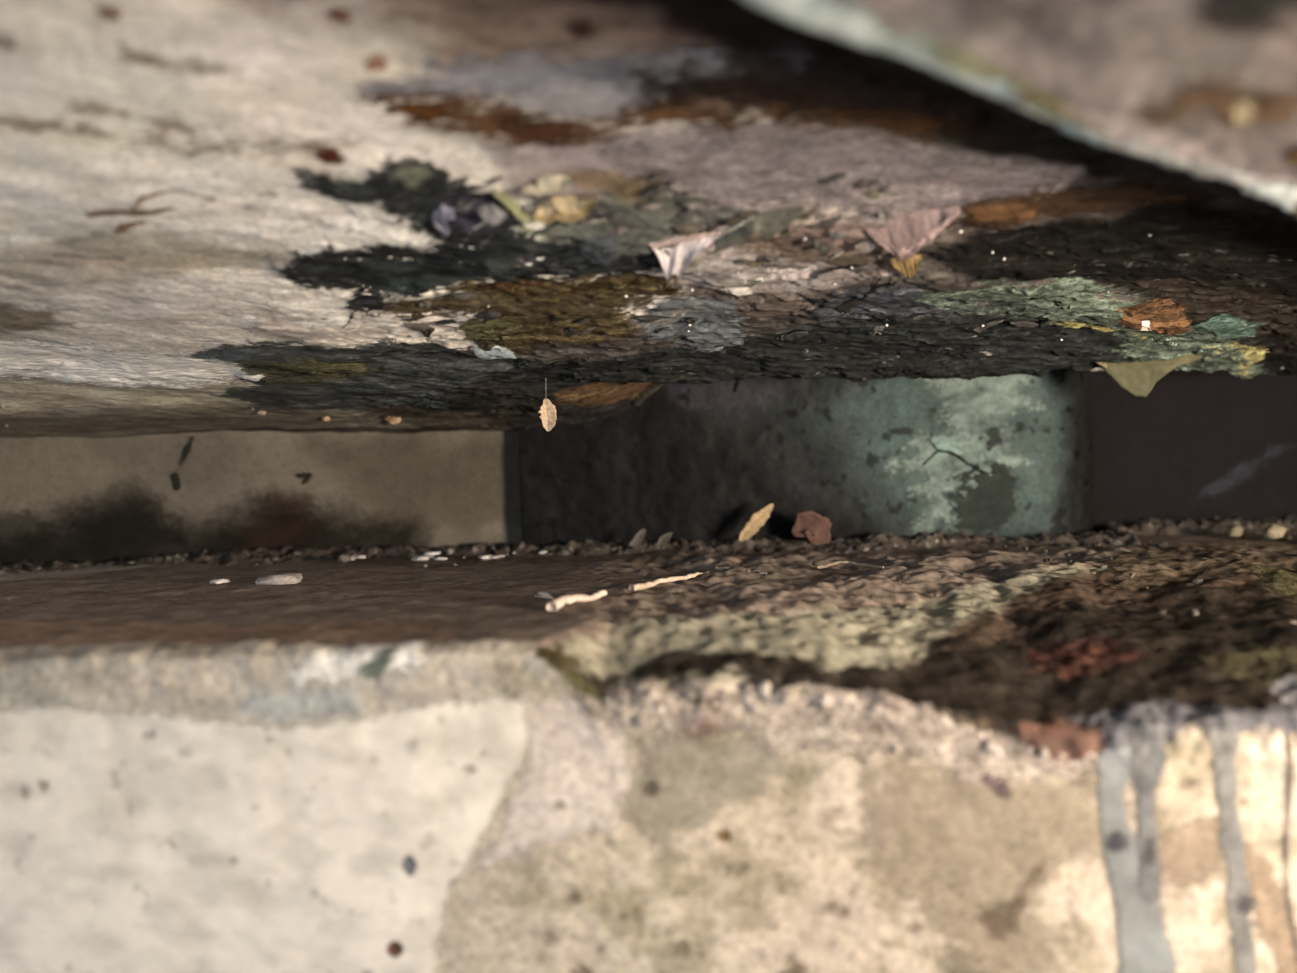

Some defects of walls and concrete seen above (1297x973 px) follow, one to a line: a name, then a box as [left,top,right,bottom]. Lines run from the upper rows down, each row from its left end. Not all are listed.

rust [361,53,1013,151]
peeling [401,300,458,338]
peeling [431,121,1072,354]
damp [0,493,421,566]
peeling [0,545,1297,973]
damp [860,674,1297,973]